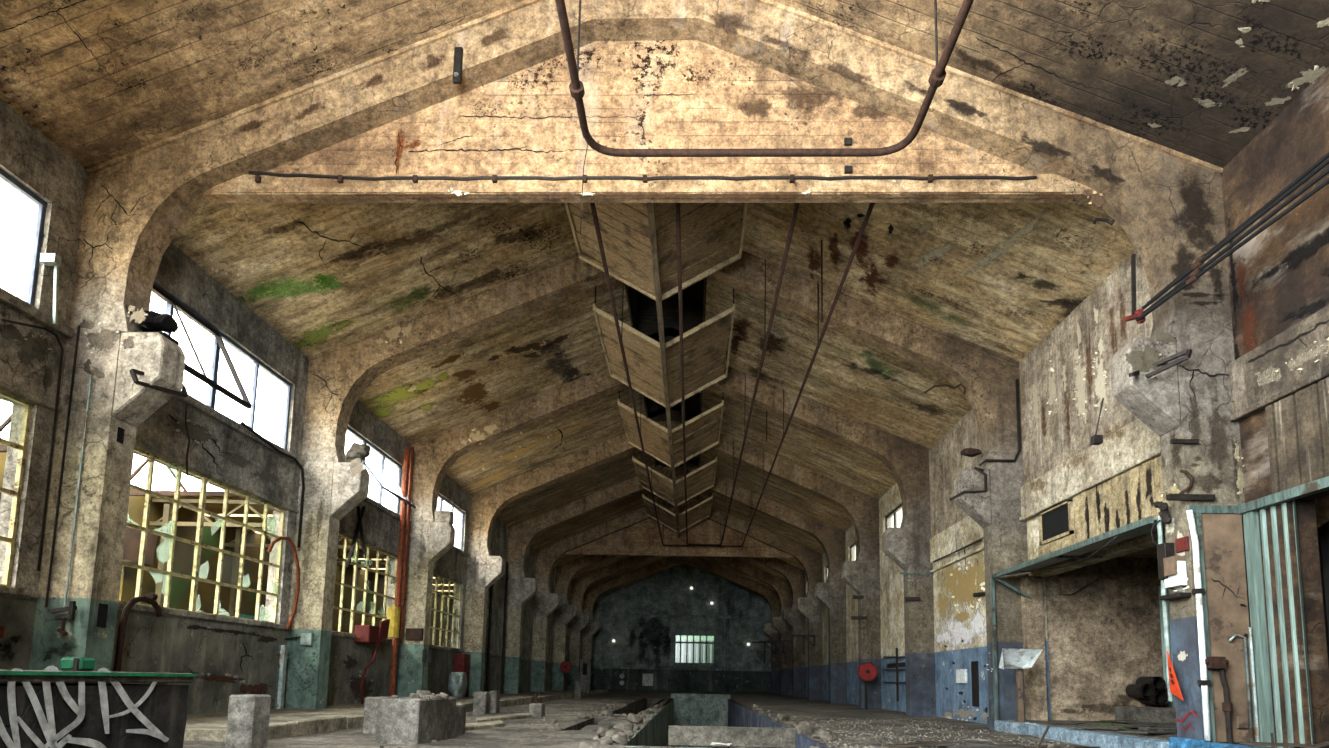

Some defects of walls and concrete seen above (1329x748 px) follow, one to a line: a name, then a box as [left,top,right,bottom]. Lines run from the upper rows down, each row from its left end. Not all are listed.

spalling [1235,27,1252,47]
leakage [507,40,714,145]
peeling [1165,76,1187,87]
peeling [1193,67,1248,108]
peeling [1264,65,1327,106]
corrosion [396,130,420,173]
crack [78,185,150,291]
leakage [1172,182,1329,360]
leakage [535,340,579,383]
peeling [937,556,989,622]